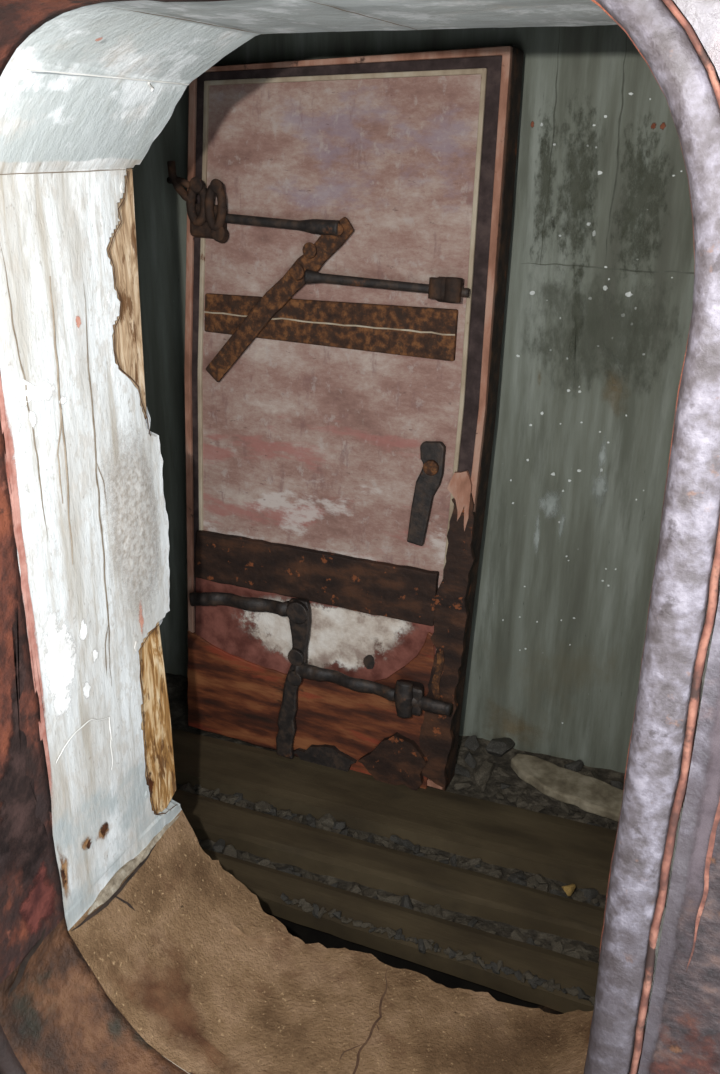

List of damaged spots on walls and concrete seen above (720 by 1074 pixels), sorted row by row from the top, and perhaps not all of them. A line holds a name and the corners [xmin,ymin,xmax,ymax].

water stain [535,111,597,249]
water stain [619,140,666,270]
spalling [106,168,151,436]
water stain [540,259,653,382]
corrosion [0,372,52,793]
spalling [87,622,180,915]
corrosion [60,859,68,898]
corrosion [82,822,109,850]
corrosion [649,820,720,1074]
corrosion [130,970,222,1064]
crack [339,968,388,1074]